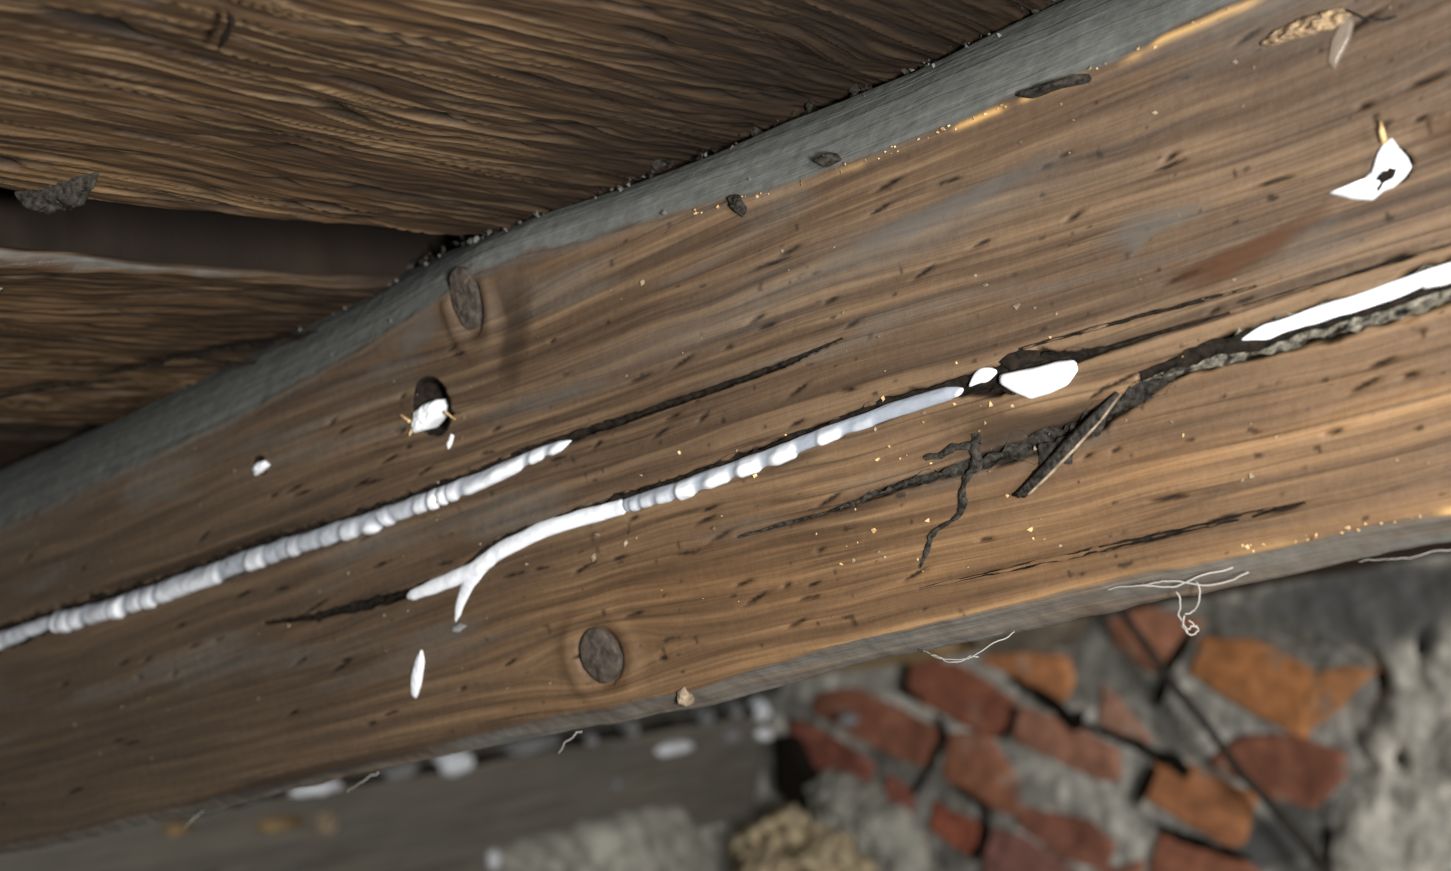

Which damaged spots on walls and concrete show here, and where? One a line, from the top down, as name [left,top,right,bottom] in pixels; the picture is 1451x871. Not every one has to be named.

crack [264,243,1451,624]